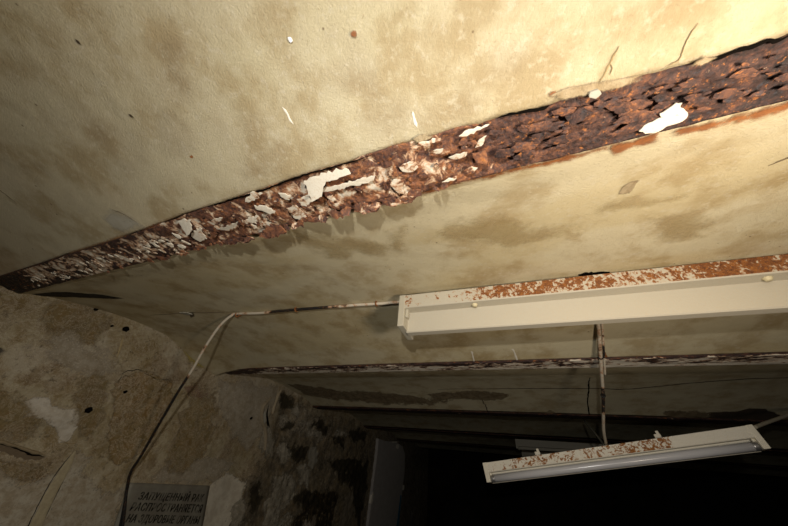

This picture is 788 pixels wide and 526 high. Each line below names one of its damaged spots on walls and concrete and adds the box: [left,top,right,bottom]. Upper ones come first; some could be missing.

rust [459,54,788,180]
peeling [639,103,688,134]
peeling [414,124,489,160]
rust [146,148,460,263]
peeling [279,168,375,220]
peeling [399,161,418,172]
peeling [443,166,477,182]
damp [39,300,112,345]
peeling [24,397,93,443]
damp [74,371,173,465]
spalling [0,440,46,460]
damp [166,380,375,526]